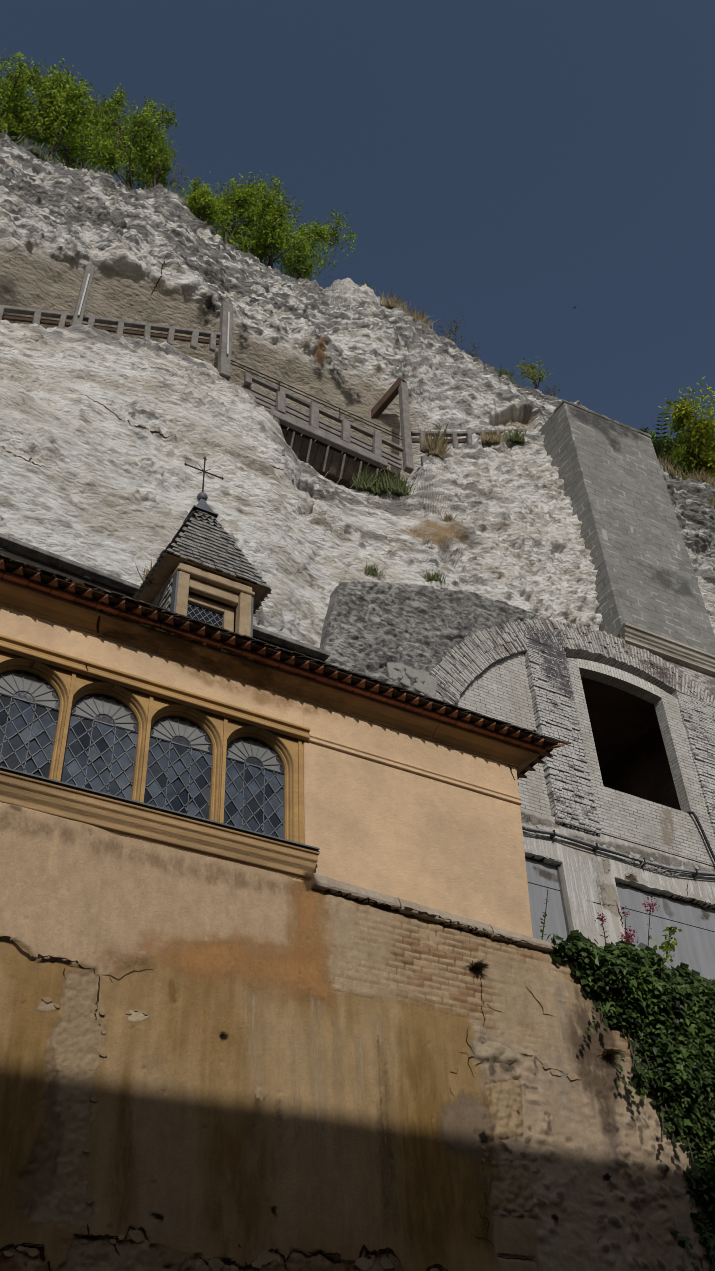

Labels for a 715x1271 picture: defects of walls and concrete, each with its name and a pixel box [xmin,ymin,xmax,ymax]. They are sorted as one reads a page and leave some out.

crack [0,936,153,1028]
spalling [18,969,107,1226]
damp [434,1094,494,1239]
damp [561,1001,620,1162]